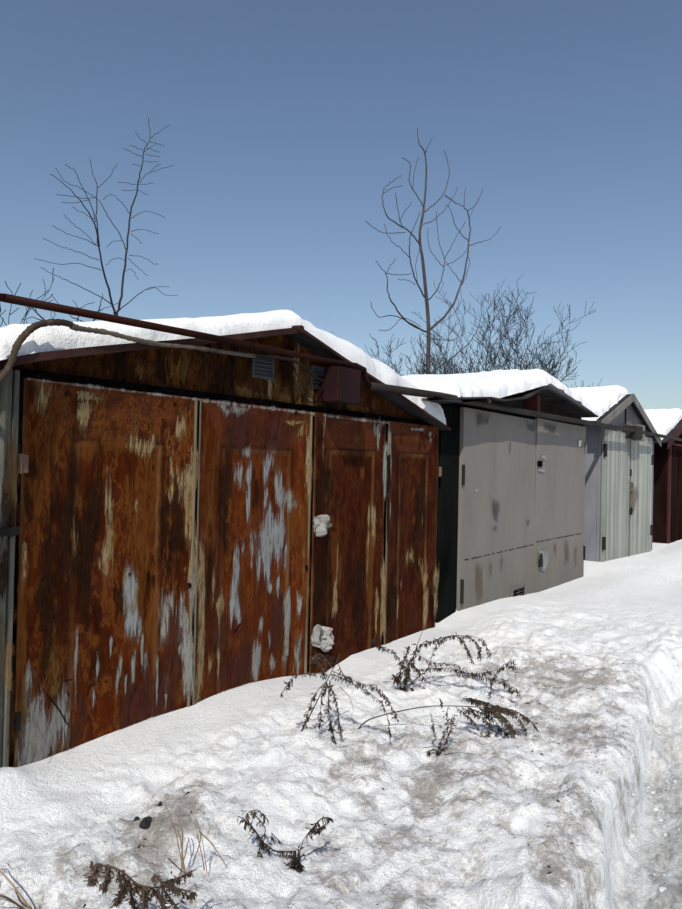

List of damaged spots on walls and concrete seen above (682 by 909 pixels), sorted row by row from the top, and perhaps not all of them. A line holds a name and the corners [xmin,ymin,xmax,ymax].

peeling [28,378,392,521]
rust [206,358,325,601]
rust [0,388,186,763]
peeling [99,492,114,576]
peeling [109,569,167,706]
rust [207,610,252,692]
peeling [158,447,302,704]
rust [269,592,282,653]
peeling [366,505,376,571]
peeling [375,561,386,639]
rust [387,565,396,639]
peeling [406,551,439,626]